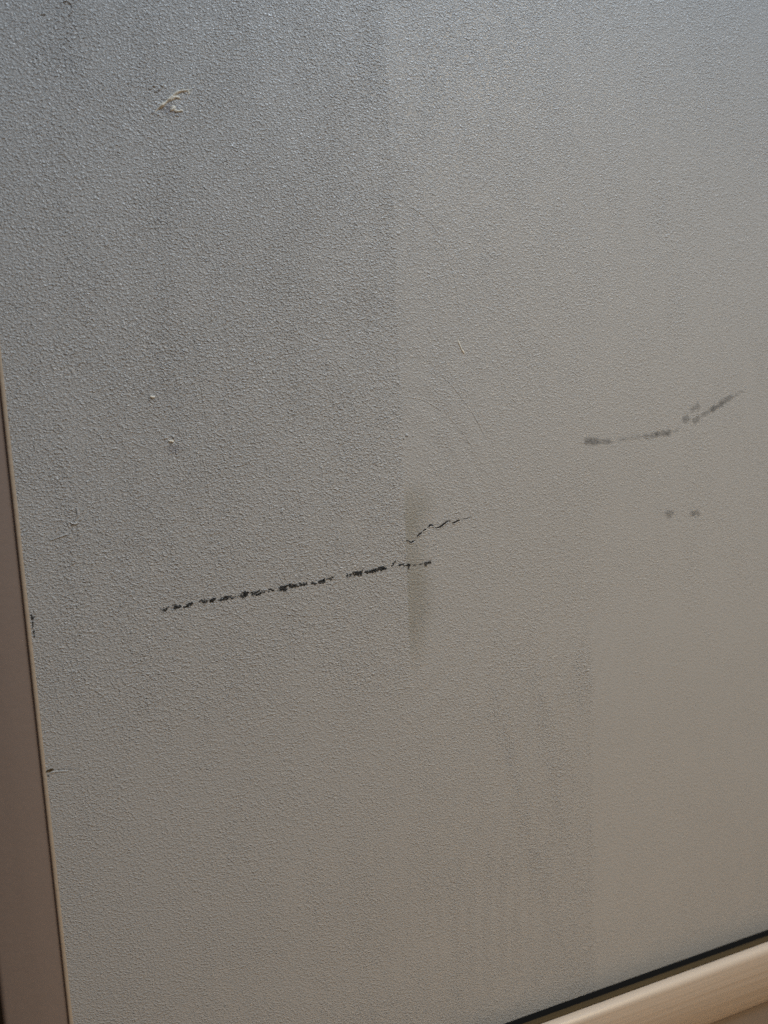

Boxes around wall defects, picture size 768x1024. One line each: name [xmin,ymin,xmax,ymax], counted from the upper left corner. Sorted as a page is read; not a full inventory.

crack [406,519,461,544]